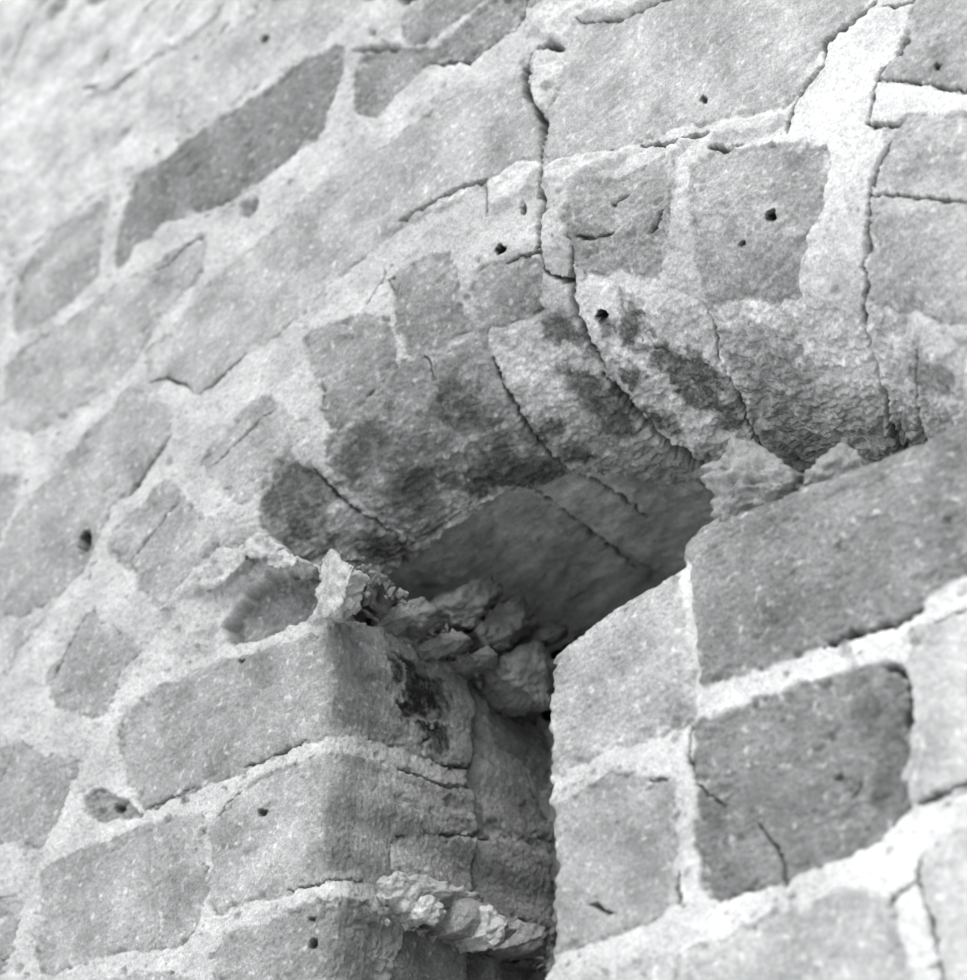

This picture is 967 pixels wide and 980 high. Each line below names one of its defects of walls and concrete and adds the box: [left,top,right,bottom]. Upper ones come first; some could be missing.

crack [431,0,529,67]
crack [575,0,671,24]
crack [785,0,915,133]
crack [640,130,746,154]
crack [504,36,707,464]
crack [858,32,967,451]
water stain [542,315,586,345]
water stain [566,301,743,438]
water stain [263,420,385,540]
water stain [463,448,595,497]
water stain [364,529,408,558]
water stain [386,652,452,753]